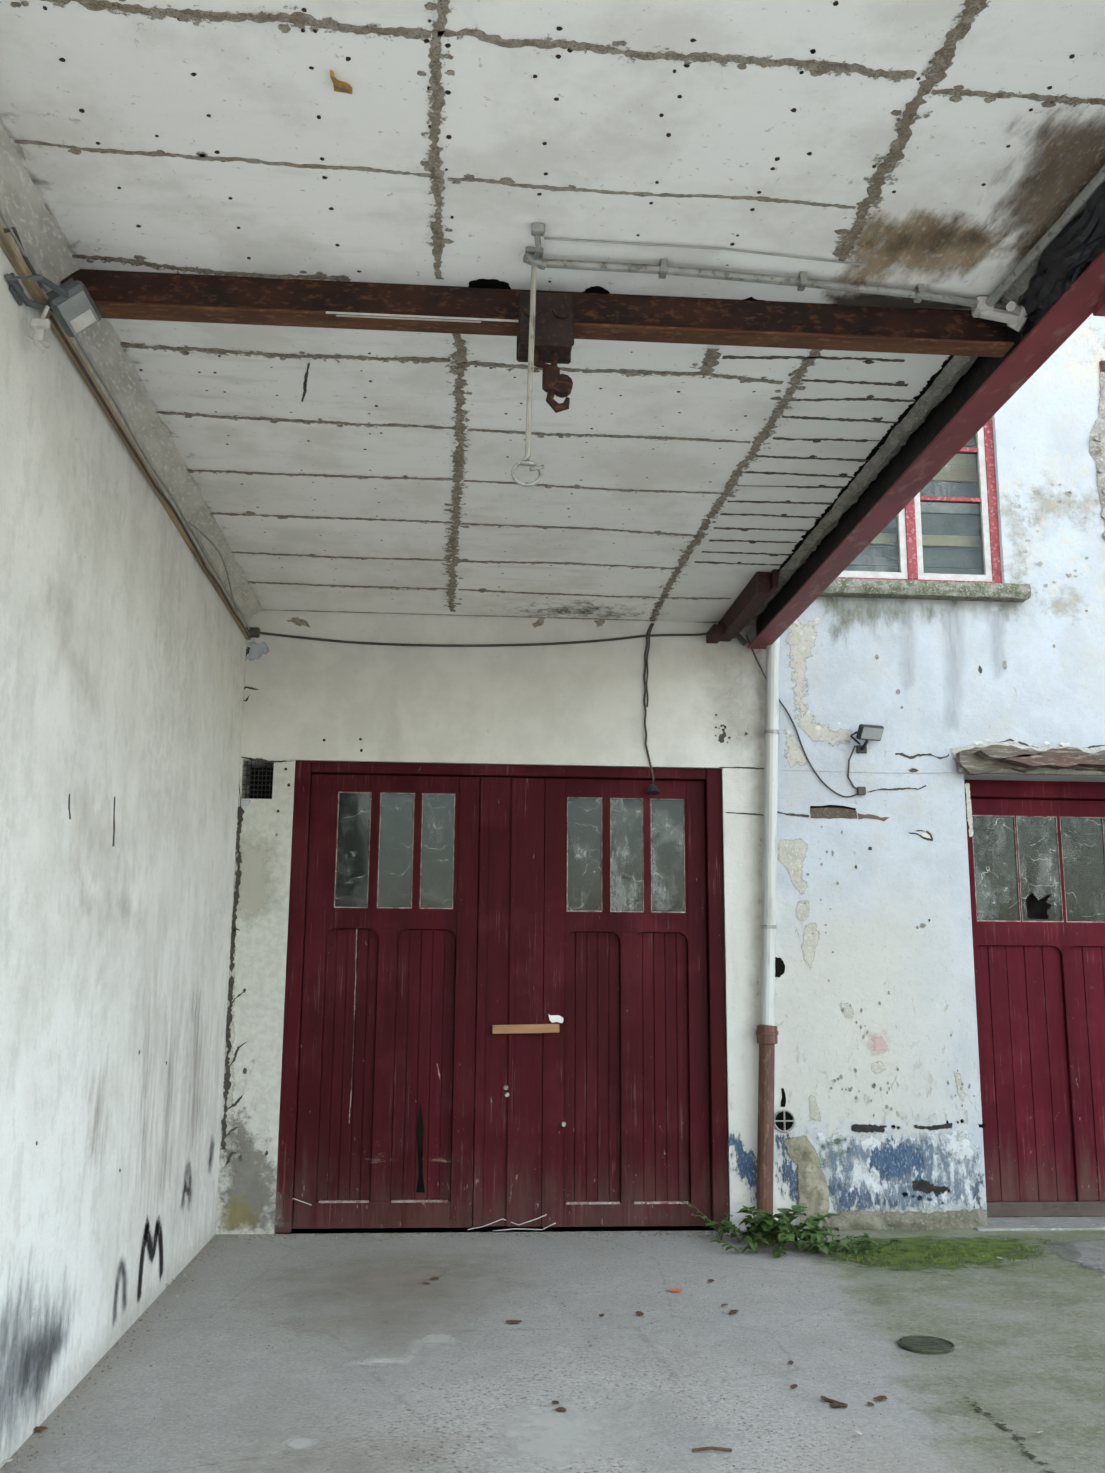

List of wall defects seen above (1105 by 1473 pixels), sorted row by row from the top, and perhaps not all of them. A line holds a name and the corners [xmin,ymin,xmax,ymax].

spalling [1023,368,1105,566]
peeling [783,618,852,767]
spalling [951,738,1105,760]
flaking render [777,805,890,834]
peeling [775,839,834,977]
peeling [840,991,890,1039]
spalling [809,1061,988,1231]